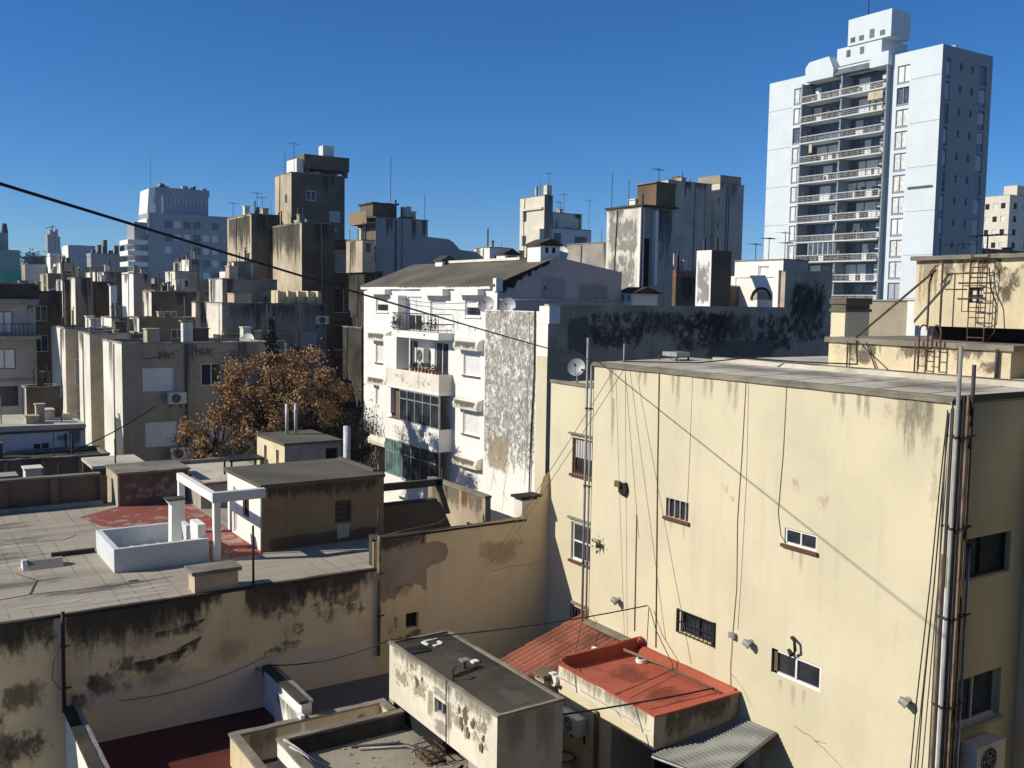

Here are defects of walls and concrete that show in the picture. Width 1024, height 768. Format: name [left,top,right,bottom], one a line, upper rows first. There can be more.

water stain [603,210,637,294]
water stain [567,263,825,358]
peeling [453,309,537,474]
peeling [125,476,177,501]
spalling [381,535,449,603]
water stain [0,594,222,708]
water stain [245,572,371,652]
peeling [395,663,428,701]
water stain [0,682,45,768]
peeling [451,703,487,754]